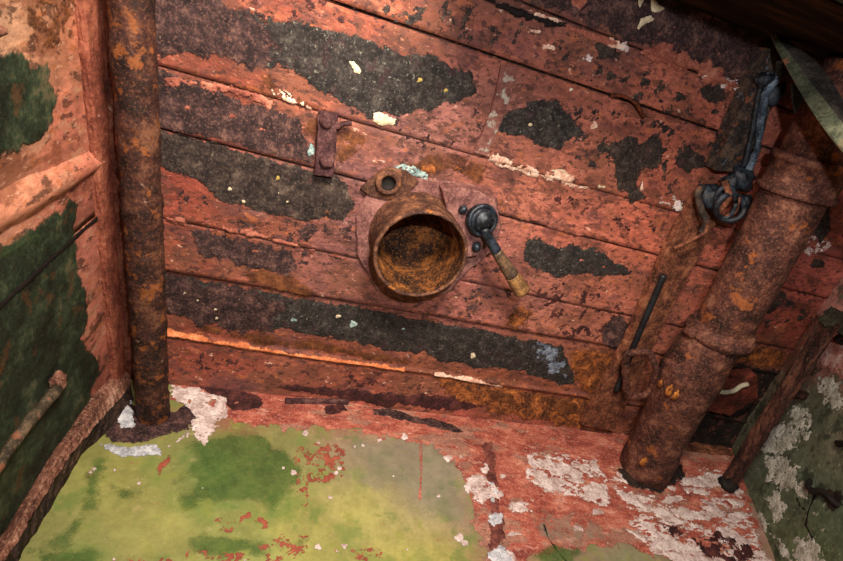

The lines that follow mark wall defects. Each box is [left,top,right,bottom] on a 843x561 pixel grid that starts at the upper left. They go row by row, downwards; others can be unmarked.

peeling [158,68,355,222]
peeling [155,0,477,126]
peeling [498,99,598,150]
rust [573,56,718,195]
peeling [528,0,773,103]
rust [167,325,410,388]
rust [428,195,718,433]
rust [736,347,786,368]
peeling [167,384,825,561]